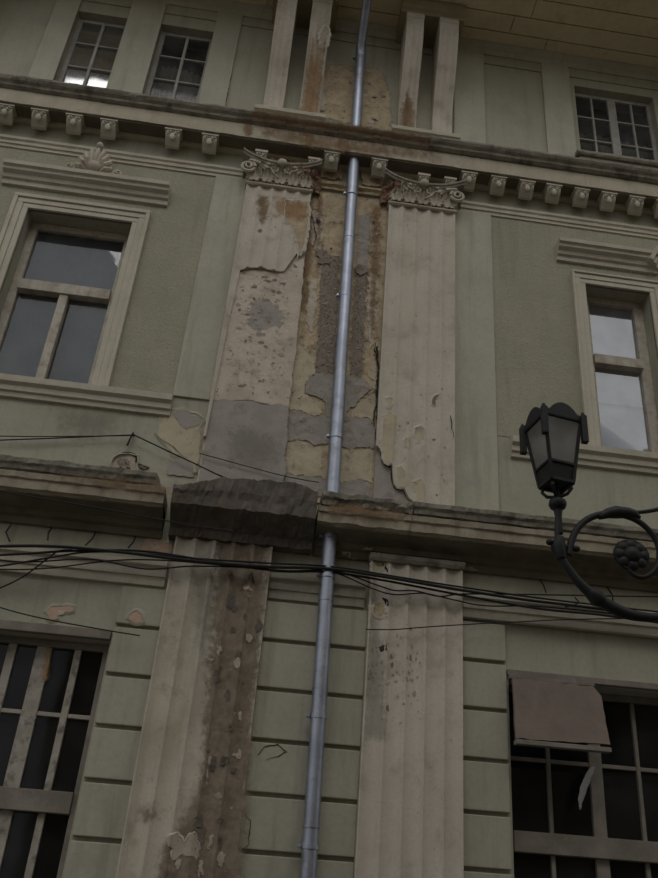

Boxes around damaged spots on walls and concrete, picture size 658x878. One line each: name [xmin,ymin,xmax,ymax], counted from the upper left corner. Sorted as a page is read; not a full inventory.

spalling [317,24,331,50]
rust [244,44,434,156]
peeling [319,63,394,130]
spalling [213,157,346,428]
peeling [340,171,446,503]
spalling [109,452,149,471]
peeling [285,431,329,503]
damp [158,541,266,878]